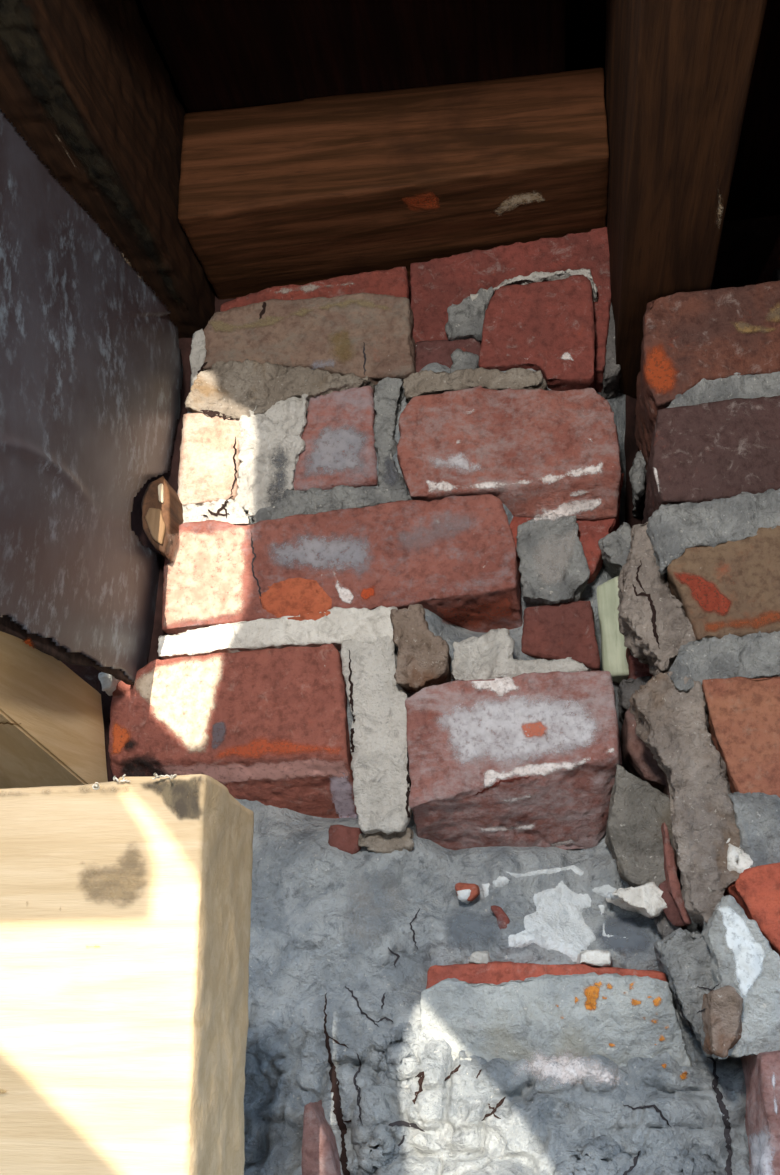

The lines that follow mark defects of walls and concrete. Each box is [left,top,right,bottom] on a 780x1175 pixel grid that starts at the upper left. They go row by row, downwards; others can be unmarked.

crack [632,560,660,649]
water stain [439,677,595,786]
crack [388,909,420,967]
crack [674,984,719,1032]
crack [323,986,482,1175]
crack [481,1097,506,1121]
crack [624,1104,671,1127]
crack [708,1057,733,1175]
crack [623,1151,641,1175]